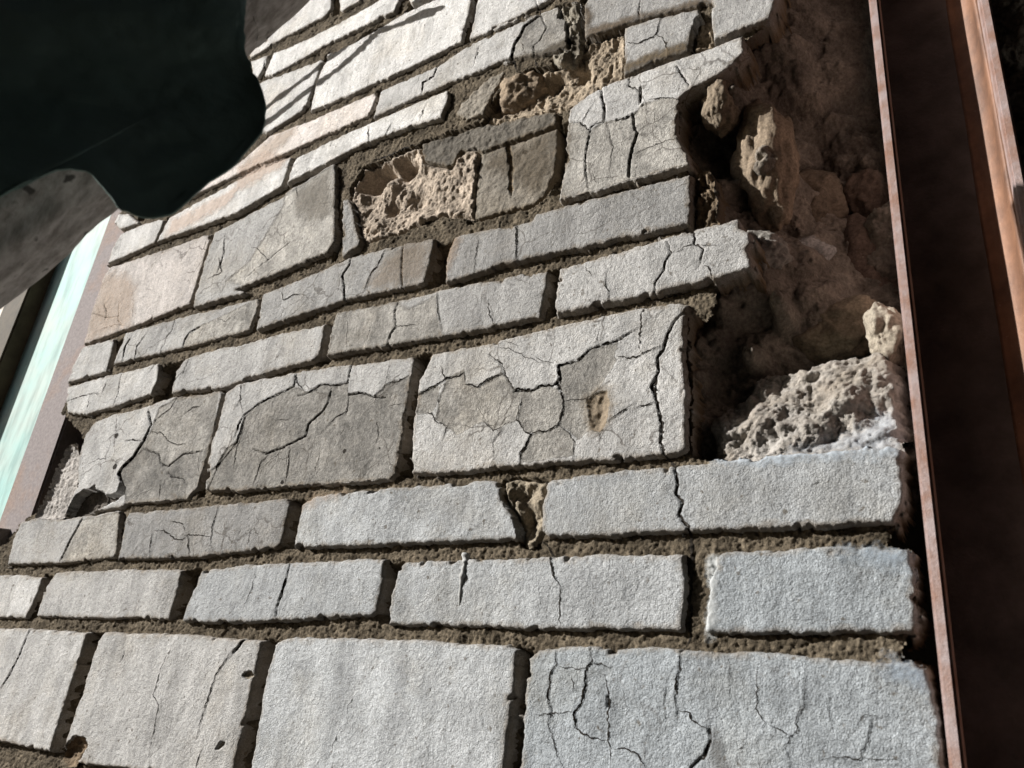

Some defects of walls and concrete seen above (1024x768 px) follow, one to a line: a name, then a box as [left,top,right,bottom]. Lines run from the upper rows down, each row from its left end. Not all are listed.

spalling [488,3,626,125]
crack [575,0,689,184]
spalling [353,148,481,245]
spalling [695,170,720,230]
peeling [35,370,610,561]
crack [71,212,713,767]
crack [736,669,830,766]
crack [830,714,890,760]